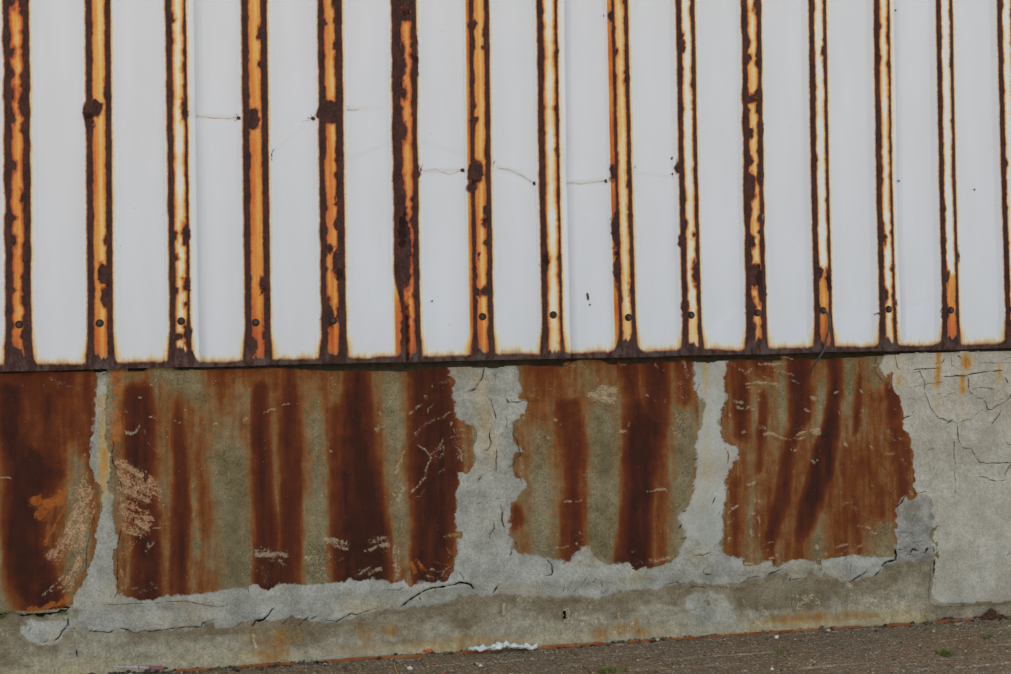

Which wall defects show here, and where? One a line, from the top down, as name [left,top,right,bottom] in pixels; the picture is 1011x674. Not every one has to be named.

corrosion [199,0,1011,367]
crack [0,441,223,655]
corrosion [0,0,454,612]
crack [252,608,376,626]
crack [398,576,499,606]
corrosion [514,360,698,561]
corrosion [724,353,910,562]
crack [742,353,1011,583]
peeling [875,355,893,382]